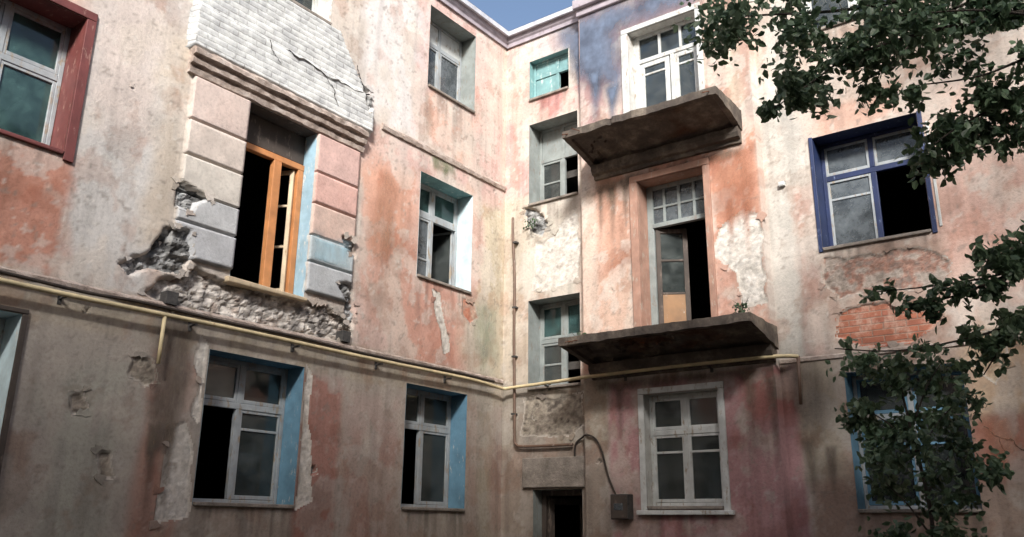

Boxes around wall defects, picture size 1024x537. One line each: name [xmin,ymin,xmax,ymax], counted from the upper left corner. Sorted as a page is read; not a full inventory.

crack [270,40,370,106]
spalling [118,175,360,343]
peeling [431,287,450,354]
peeling [519,205,582,292]
peeling [714,210,768,307]
spalling [818,245,953,349]
spalling [127,351,161,389]
peeling [149,334,209,530]
peeling [294,364,318,511]